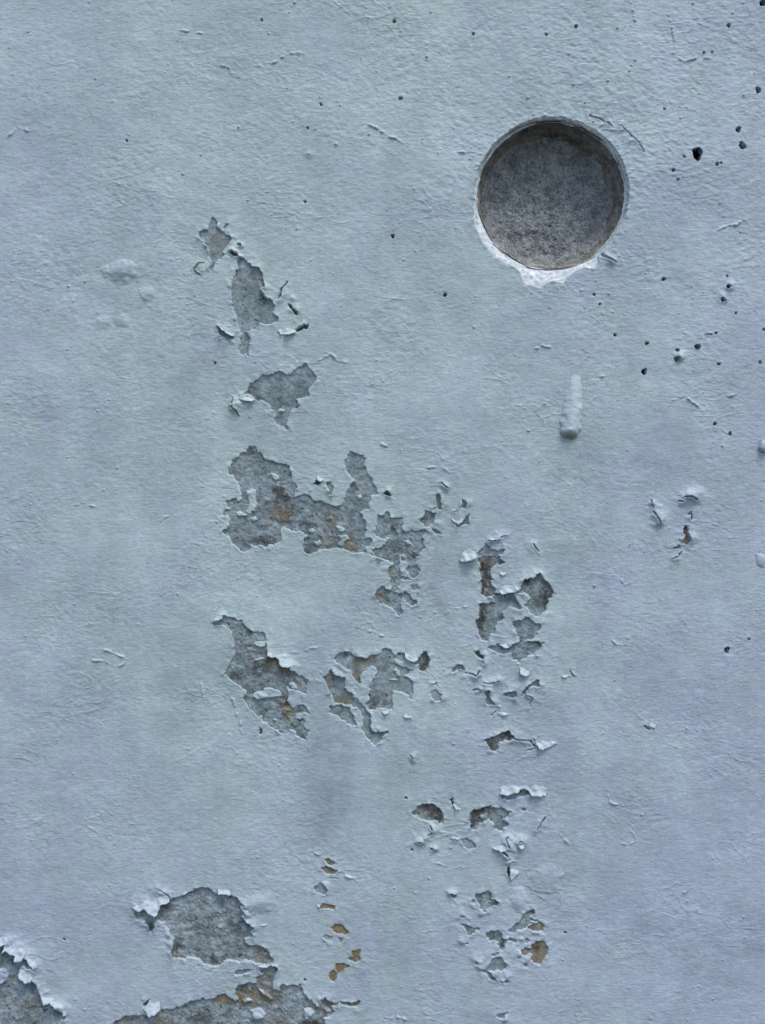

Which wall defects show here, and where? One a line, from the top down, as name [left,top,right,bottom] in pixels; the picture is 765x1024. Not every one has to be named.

peeling [199,218,231,270]
peeling [217,259,308,356]
peeling [239,364,317,430]
peeling [223,446,441,616]
peeling [459,534,553,677]
peeling [212,616,309,739]
peeling [323,648,430,745]
peeling [484,731,514,751]
peeling [412,784,547,849]
peeling [0,936,68,1024]
peeling [114,887,360,1024]
peeling [461,909,544,983]